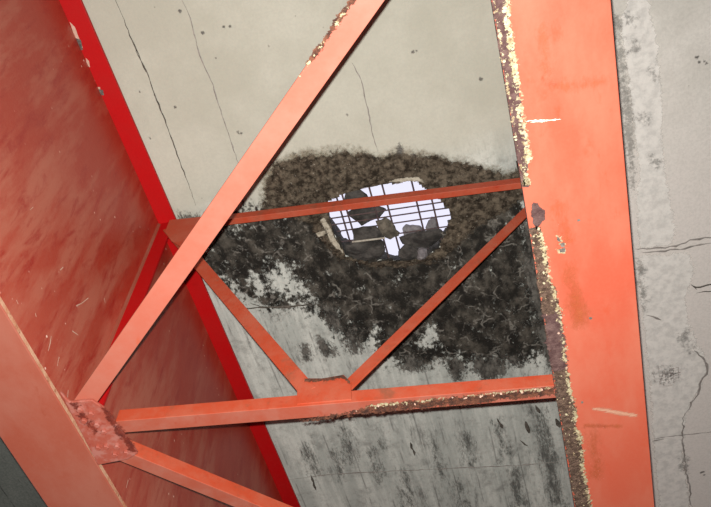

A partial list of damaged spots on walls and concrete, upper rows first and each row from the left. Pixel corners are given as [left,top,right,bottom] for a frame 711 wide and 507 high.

crack [115,0,196,205]
crack [182,1,238,162]
corrosion [299,0,355,77]
crack [352,63,378,151]
spalling [262,0,533,268]
crack [637,237,711,253]
damp [201,199,551,382]
peeling [529,203,592,507]
corrosion [101,407,138,452]
corrosion [302,387,555,422]
crack [650,432,710,441]